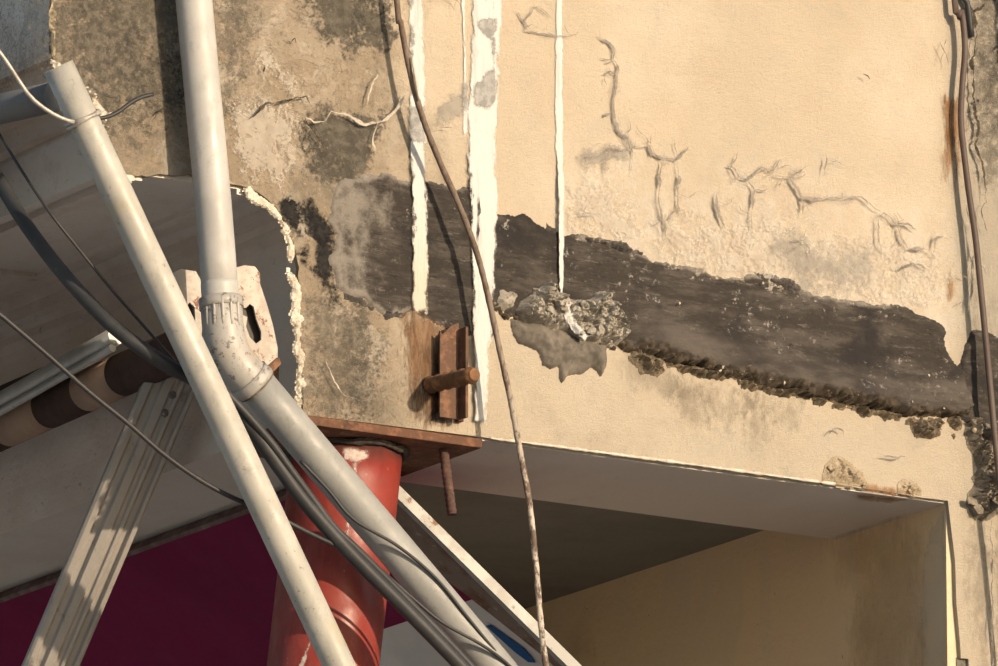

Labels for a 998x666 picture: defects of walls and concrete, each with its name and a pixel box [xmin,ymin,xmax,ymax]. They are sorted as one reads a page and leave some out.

crack [244,96,327,150]
damp [278,196,340,308]
damp [297,0,429,313]
peeling [327,173,476,336]
damp [437,0,502,422]
crack [518,7,577,37]
peeling [491,214,998,522]
crack [585,39,943,278]
corrosion [943,94,960,170]
crack [959,3,998,309]